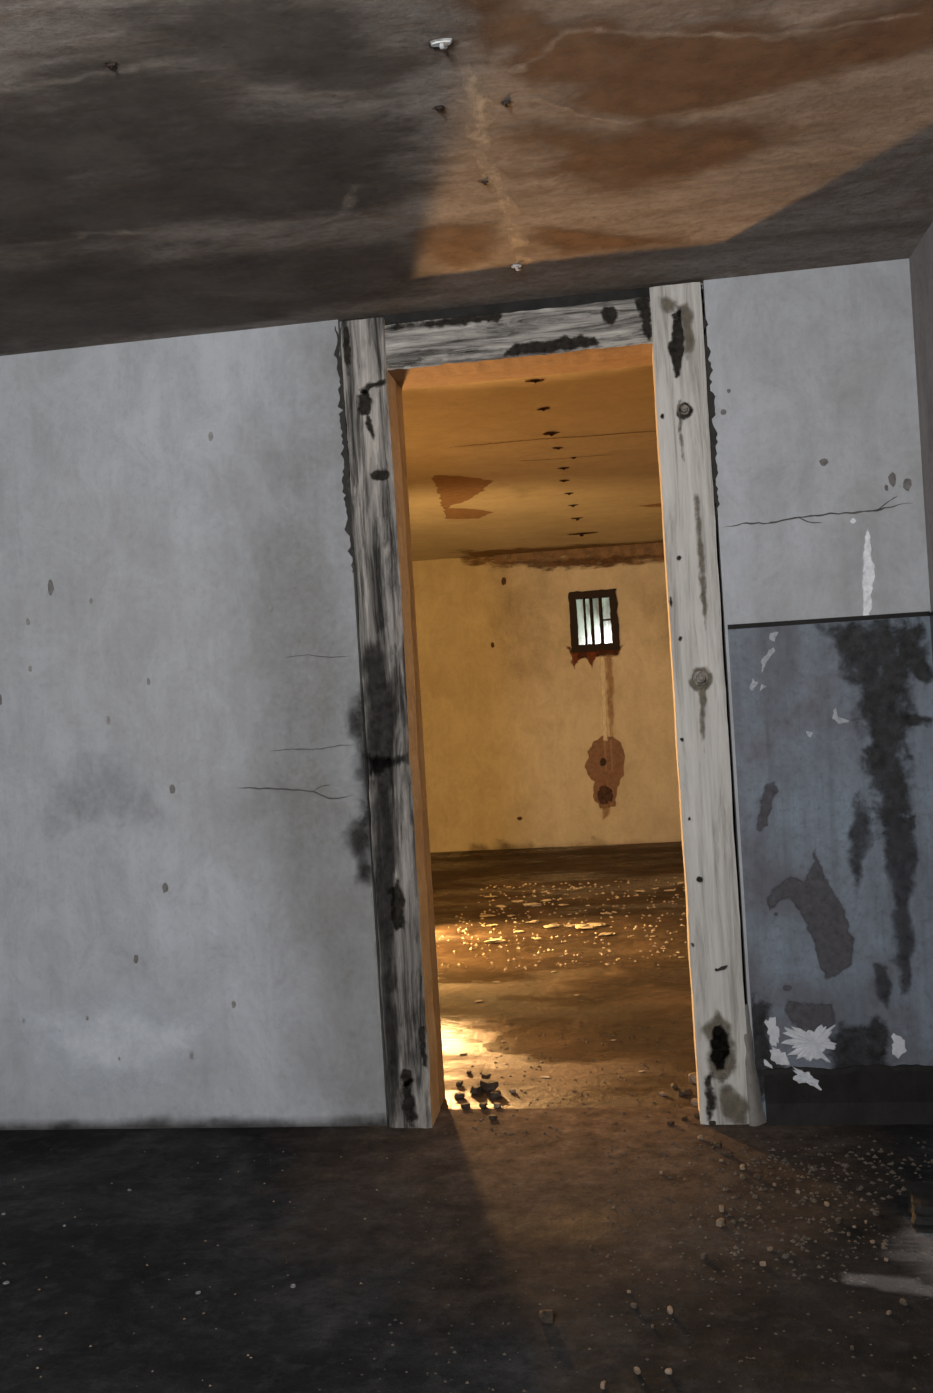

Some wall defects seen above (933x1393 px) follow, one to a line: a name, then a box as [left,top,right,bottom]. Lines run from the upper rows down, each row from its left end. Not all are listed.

crack [701,283,906,527]
corrosion [567,646,622,723]
crack [245,785,351,799]
crack [274,744,348,752]
damp [828,518,933,1069]
peeling [767,853,854,978]
spalling [764,985,836,1091]
spalling [891,1033,907,1059]